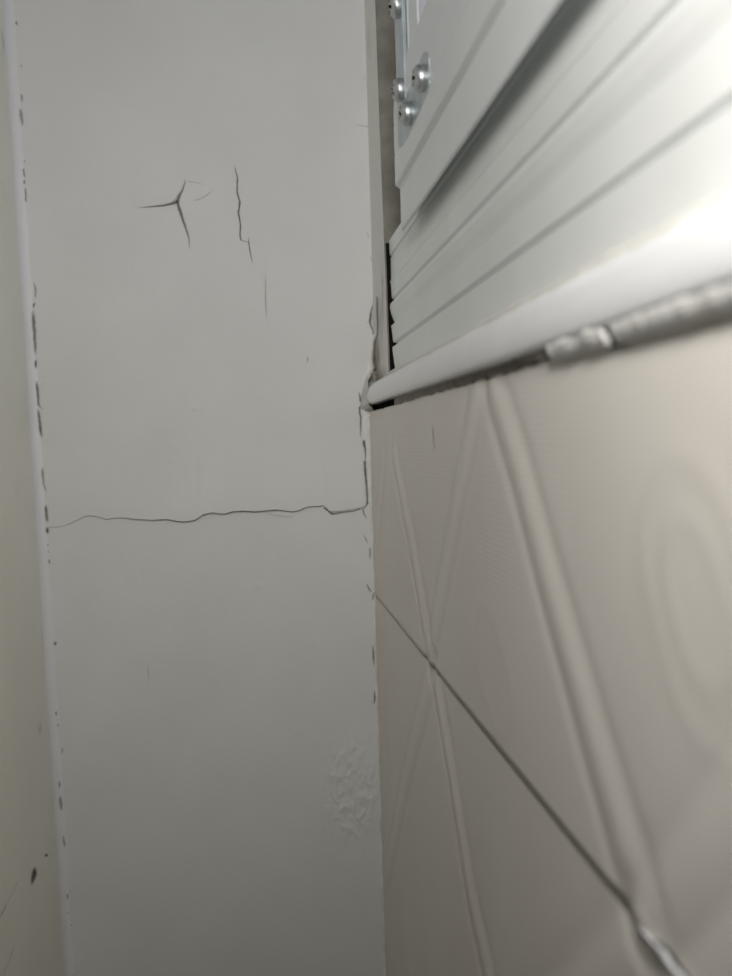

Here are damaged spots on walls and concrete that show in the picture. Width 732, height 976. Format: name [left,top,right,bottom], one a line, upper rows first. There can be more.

crack [235,170,252,259]
crack [32,288,42,434]
crack [369,296,378,370]
crack [359,394,368,504]